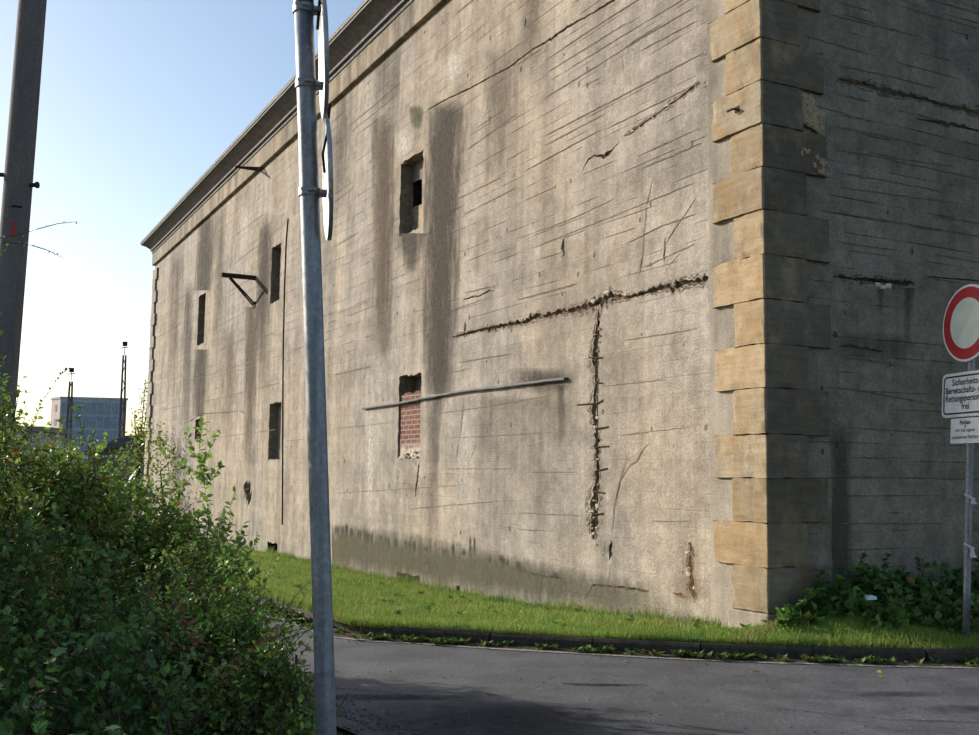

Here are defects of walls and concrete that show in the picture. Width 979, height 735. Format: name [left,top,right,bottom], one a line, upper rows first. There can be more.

crack [582,141,620,171]
spalling [802,92,826,137]
water stain [373,107,462,405]
crack [453,177,708,340]
crack [834,272,979,290]
spalling [588,408,604,540]
water stain [332,526,630,609]
spalling [672,542,697,602]